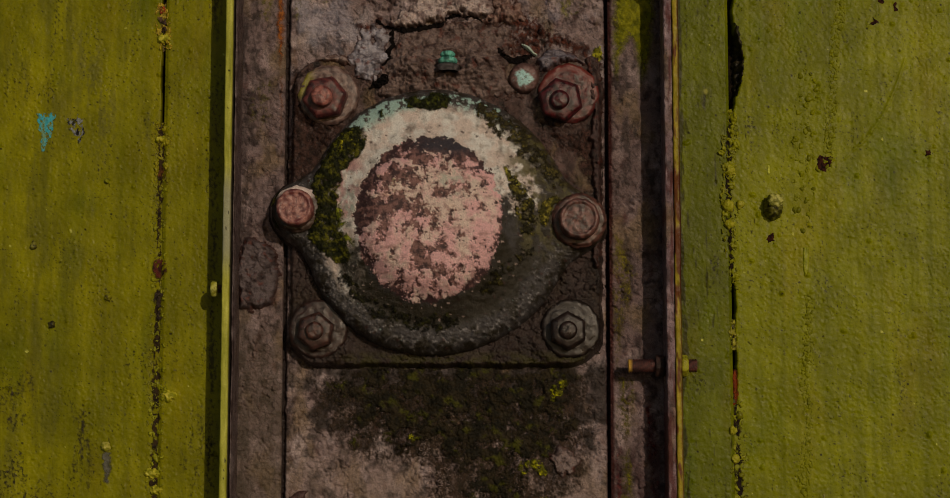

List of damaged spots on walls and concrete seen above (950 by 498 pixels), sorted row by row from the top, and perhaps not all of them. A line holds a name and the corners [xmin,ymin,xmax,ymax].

peeling [314,0,526,84]
rust [376,6,590,102]
rust [154,292,163,320]
rust [151,258,167,279]
water stain [314,368,596,498]